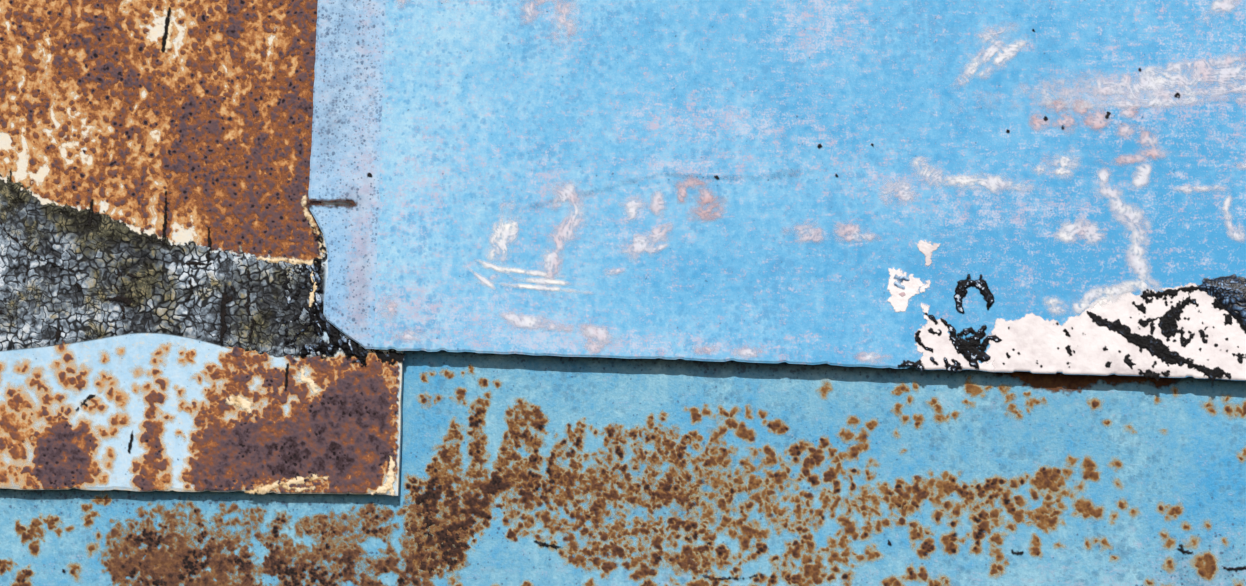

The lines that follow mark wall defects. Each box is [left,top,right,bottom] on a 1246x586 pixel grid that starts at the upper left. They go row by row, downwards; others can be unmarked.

corrosion [0,0,357,264]
crack [0,168,325,390]
corrosion [0,340,1179,586]
peeling [887,240,1246,381]
corrosion [1144,502,1228,586]
corrosion [1203,395,1246,418]